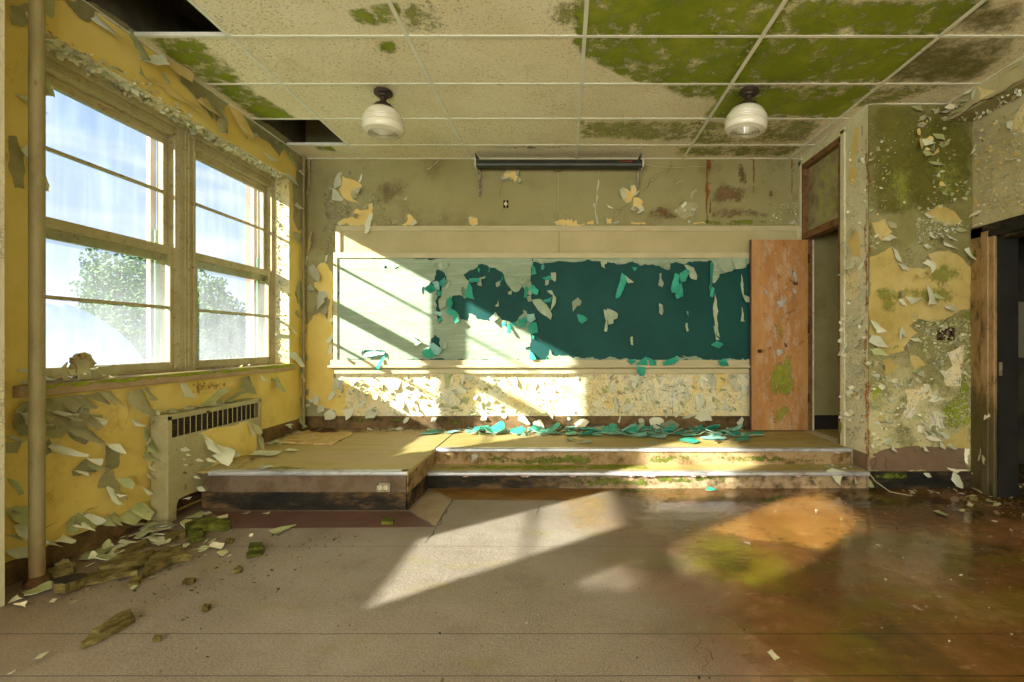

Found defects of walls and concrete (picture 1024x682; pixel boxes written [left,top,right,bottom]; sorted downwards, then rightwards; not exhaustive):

peeling [9,3,28,27]
peeling [8,135,28,189]
peeling [46,0,750,467]
peeling [801,82,1024,488]
peeling [6,401,28,453]
peeling [46,387,231,567]
peeling [5,478,28,559]